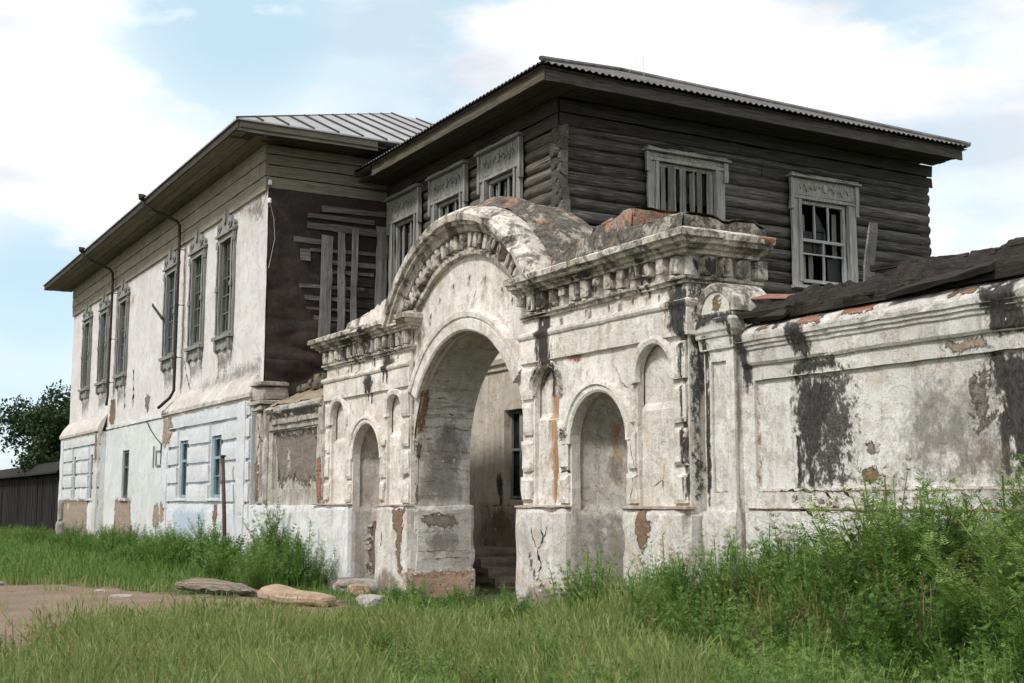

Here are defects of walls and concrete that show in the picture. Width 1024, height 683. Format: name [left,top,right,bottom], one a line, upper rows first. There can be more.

spalling [411,389,431,462]
water stain [525,276,563,397]
water stain [663,253,761,507]
water stain [783,321,860,496]
peeling [945,333,988,355]
water stain [910,276,1024,484]
peeling [965,362,997,437]
peeling [62,496,89,535]
peeling [113,497,131,537]
peeling [152,503,167,532]
spalling [391,483,418,588]
crack [531,527,547,580]